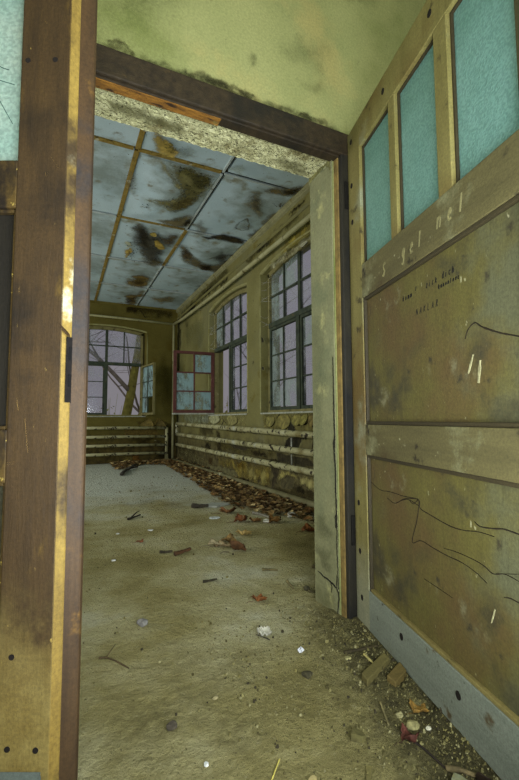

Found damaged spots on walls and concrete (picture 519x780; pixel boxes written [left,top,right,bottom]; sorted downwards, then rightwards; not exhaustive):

leakage [125,162,304,465]
crack [465,322,519,339]
leakage [276,471,314,501]
crack [372,483,519,603]